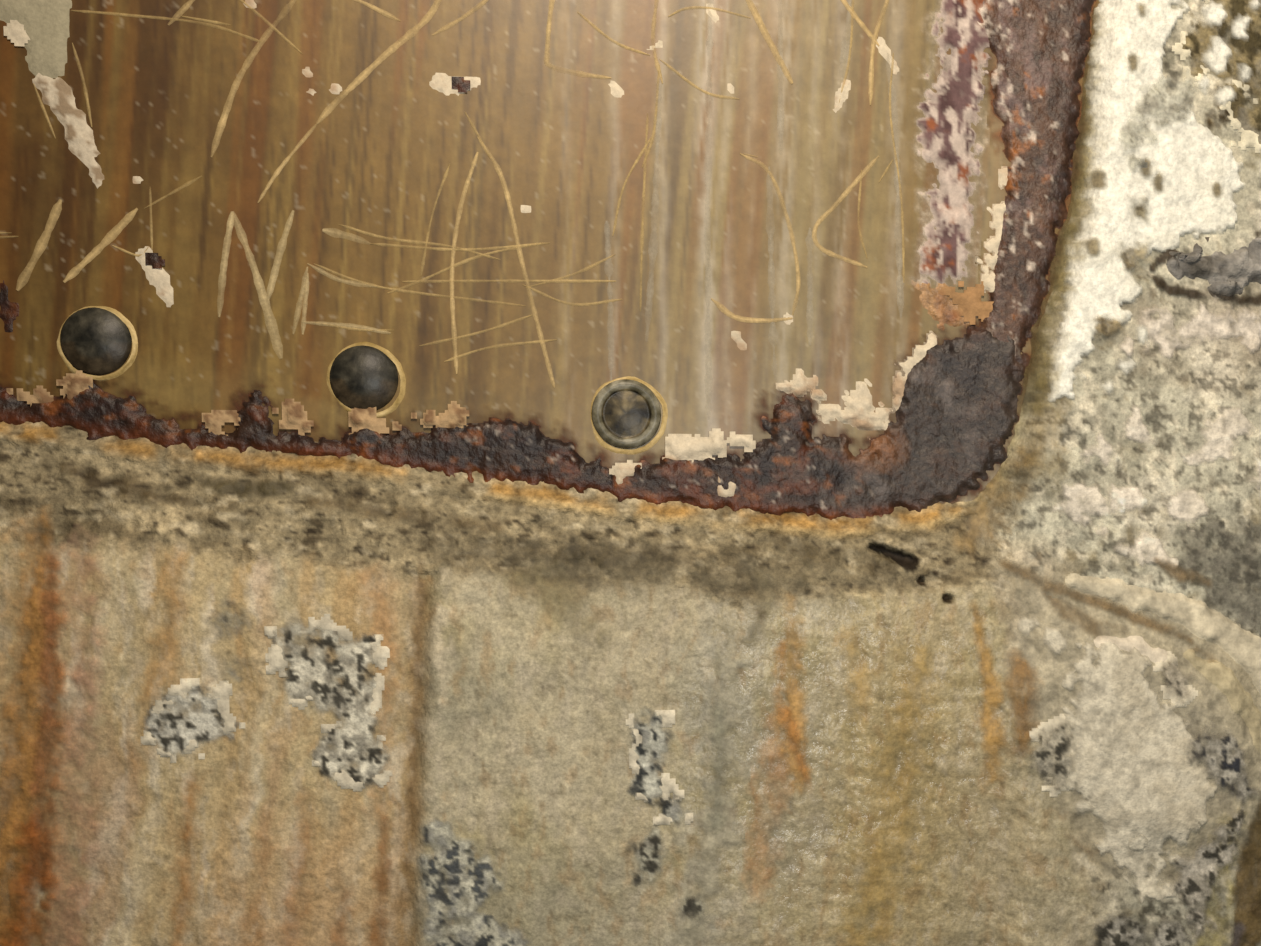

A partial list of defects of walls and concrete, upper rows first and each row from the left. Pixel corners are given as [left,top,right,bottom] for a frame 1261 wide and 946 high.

rust [0,0,1096,520]
water stain [1048,96,1092,294]
peeling [1048,0,1261,401]
water stain [206,480,293,497]
water stain [956,483,1024,551]
spalling [140,670,245,763]
spalling [264,614,393,791]
spalling [419,820,528,946]
spalling [626,710,693,883]
spalling [682,899,703,914]
peeling [1018,617,1258,946]
water stain [1224,805,1261,946]